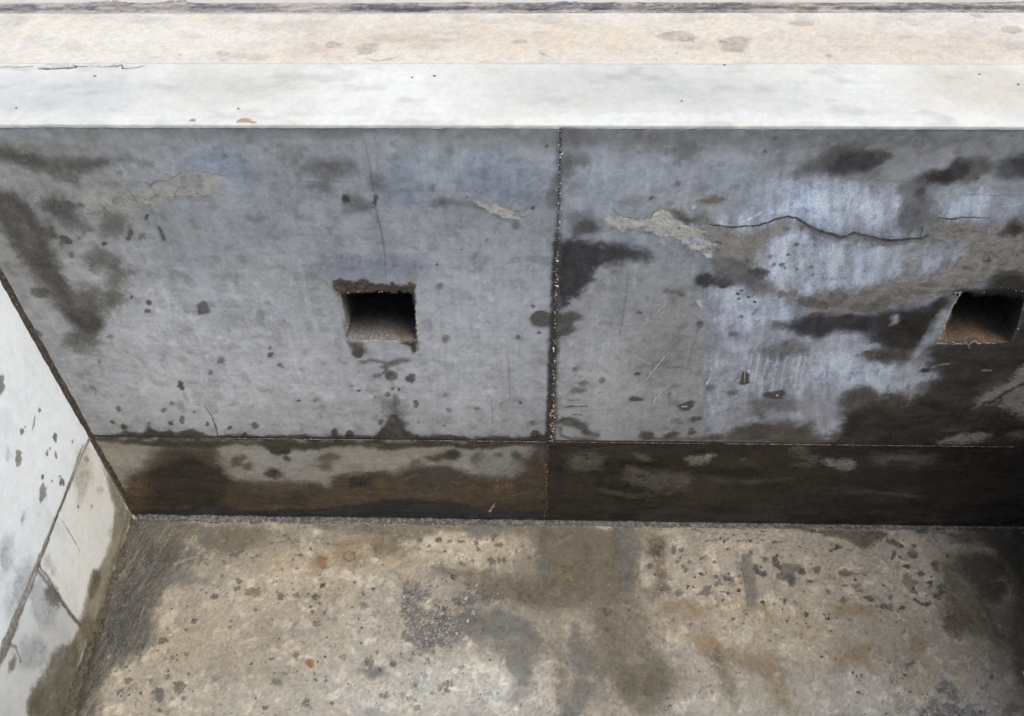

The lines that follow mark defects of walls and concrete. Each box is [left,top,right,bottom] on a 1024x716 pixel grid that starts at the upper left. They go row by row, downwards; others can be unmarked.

spalling [476,202,526,220]
crack [617,210,991,244]
peeling [605,209,1024,346]
water stain [0,144,1024,716]